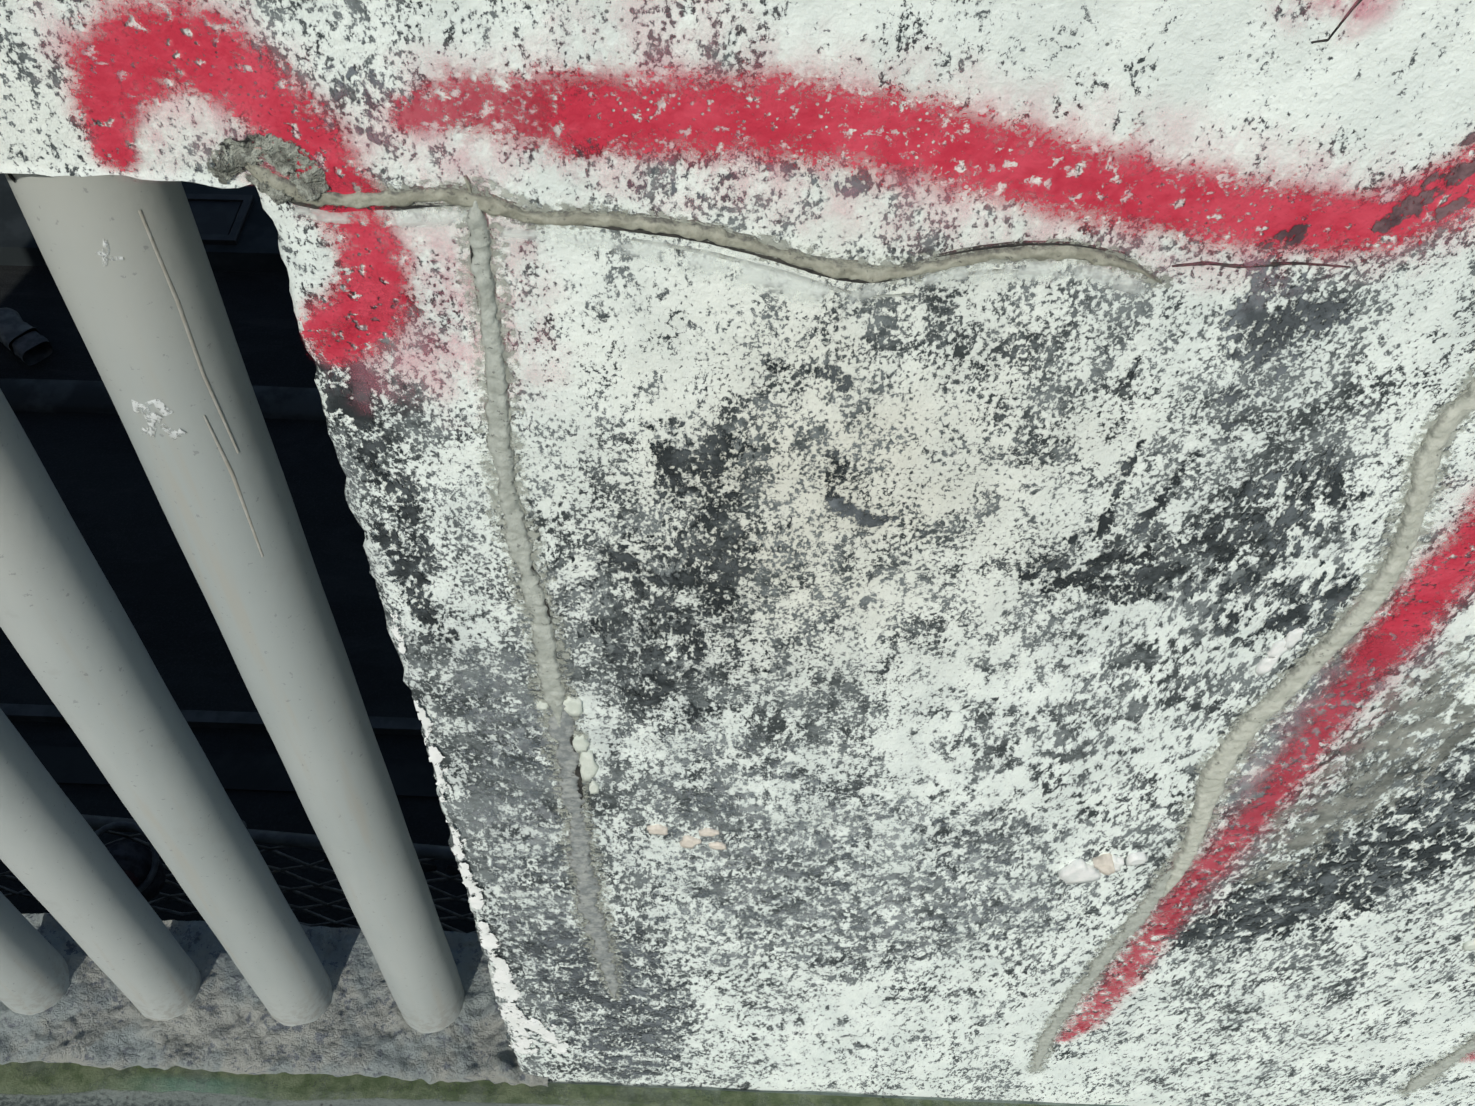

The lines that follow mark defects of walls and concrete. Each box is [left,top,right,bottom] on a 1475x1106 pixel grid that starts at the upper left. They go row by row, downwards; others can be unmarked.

crack [1311,0,1362,43]
crack [242,157,1351,1001]
crack [1027,368,1475,1073]
crack [1391,1033,1475,1098]